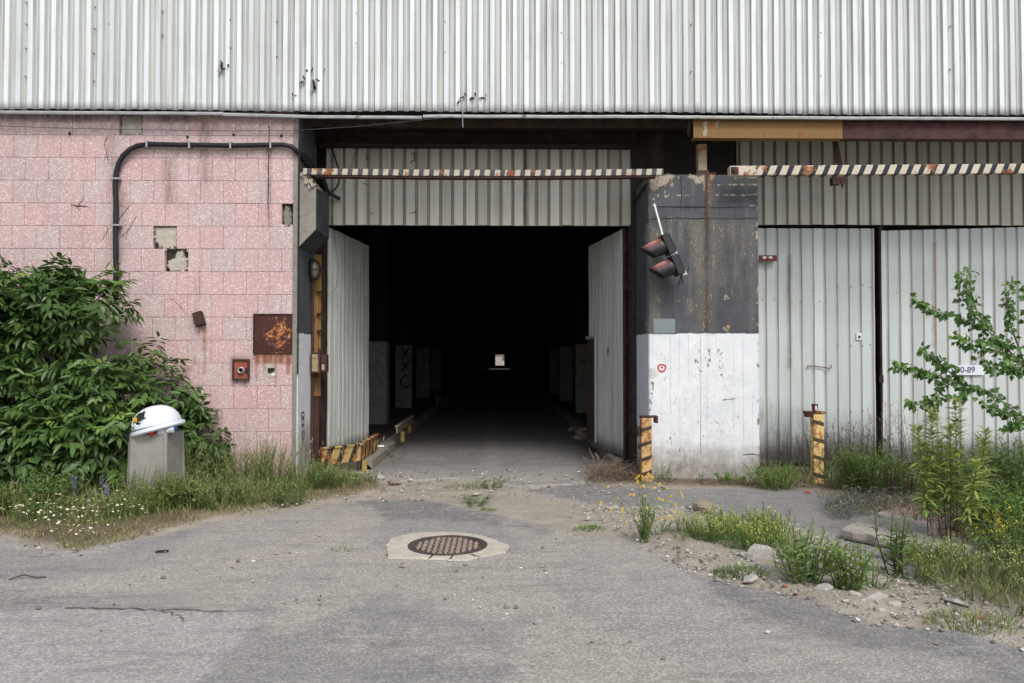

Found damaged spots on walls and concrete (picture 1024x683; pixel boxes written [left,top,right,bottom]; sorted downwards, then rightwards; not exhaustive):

peeling [281,205,293,227]
peeling [153,227,189,272]
spalling [650,173,760,386]
corrosion [255,353,291,372]
crack [65,607,259,622]